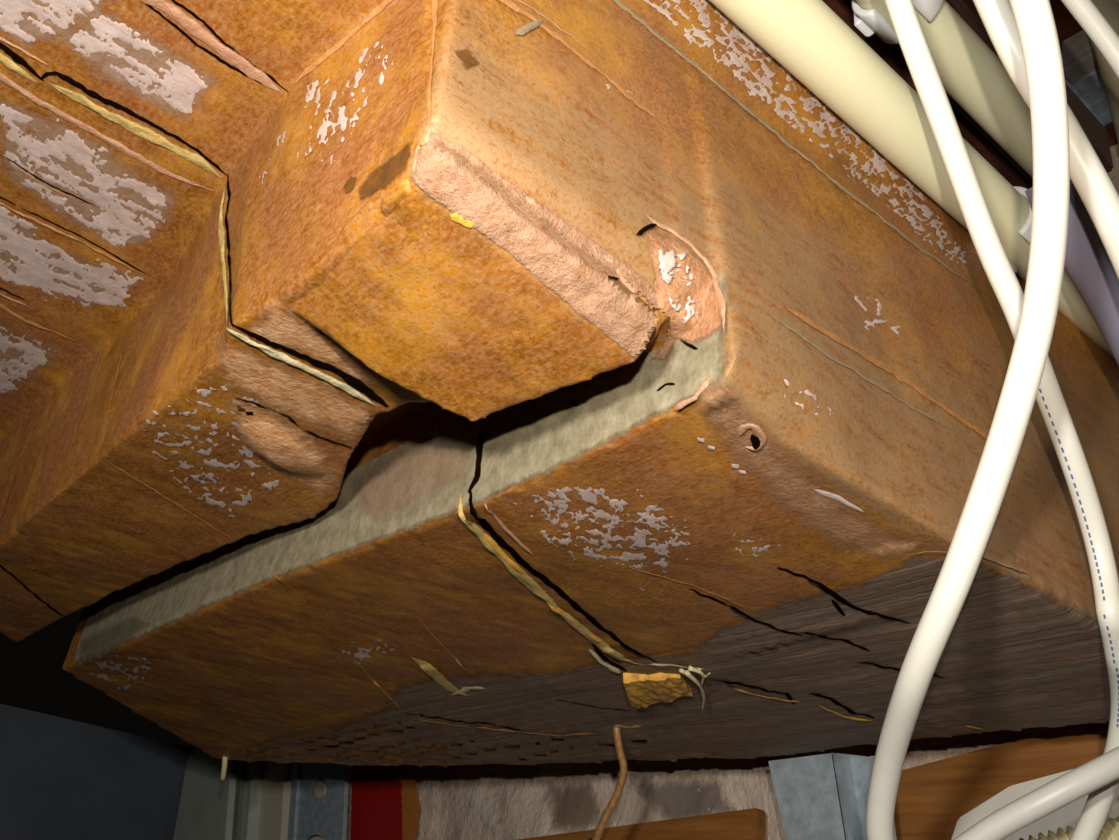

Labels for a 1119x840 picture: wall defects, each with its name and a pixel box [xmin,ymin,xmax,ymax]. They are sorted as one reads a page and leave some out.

crack [140,0,288,92]
crack [0,37,388,407]
peeling [410,132,726,360]
crack [457,433,874,721]
crack [689,567,909,671]